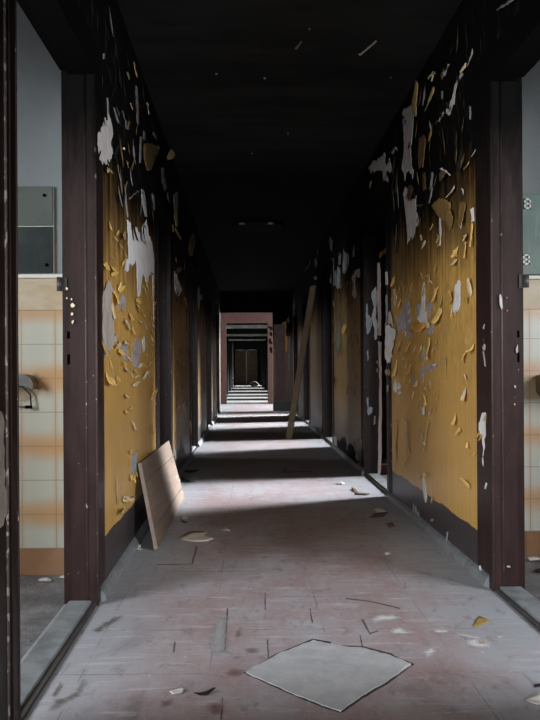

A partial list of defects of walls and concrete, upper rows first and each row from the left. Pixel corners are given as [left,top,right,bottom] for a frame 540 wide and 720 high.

peeling [368,24,476,266]
flaking render [97,7,196,387]
peeling [328,237,360,299]
flaking render [366,248,472,475]
flaking render [130,449,138,483]
flaking render [419,472,433,504]
flaking render [465,412,487,464]